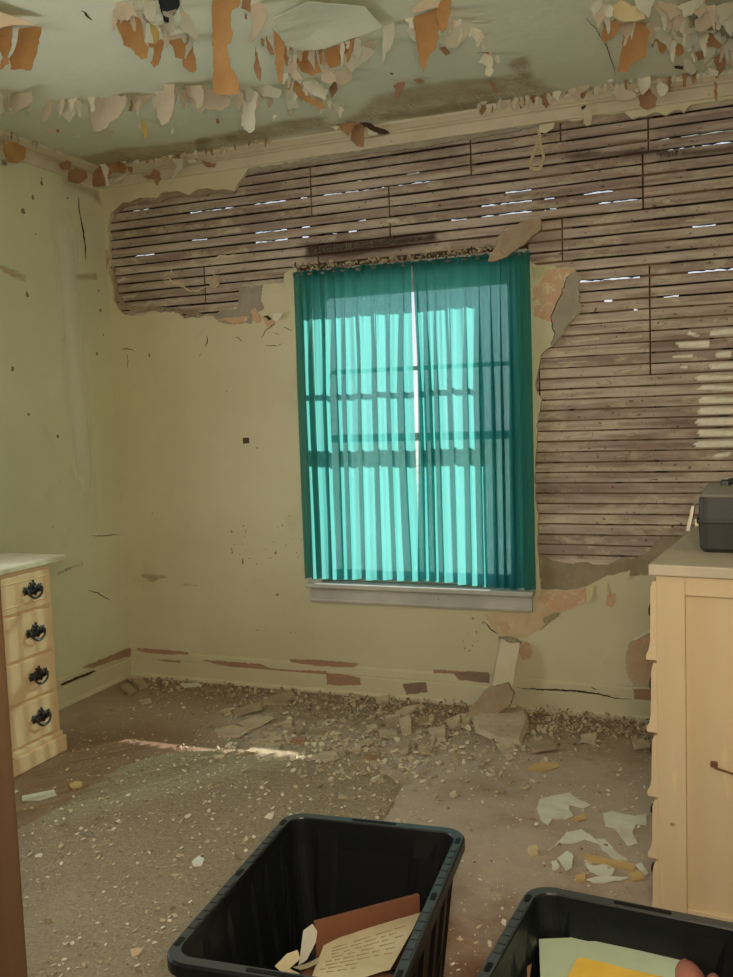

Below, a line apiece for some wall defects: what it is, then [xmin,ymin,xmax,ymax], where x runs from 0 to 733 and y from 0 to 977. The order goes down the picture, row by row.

crack [78,197,86,260]
spalling [0,0,733,661]
peeling [84,648,189,668]
peeling [203,659,361,686]
crack [518,687,627,699]
peeling [625,630,655,700]